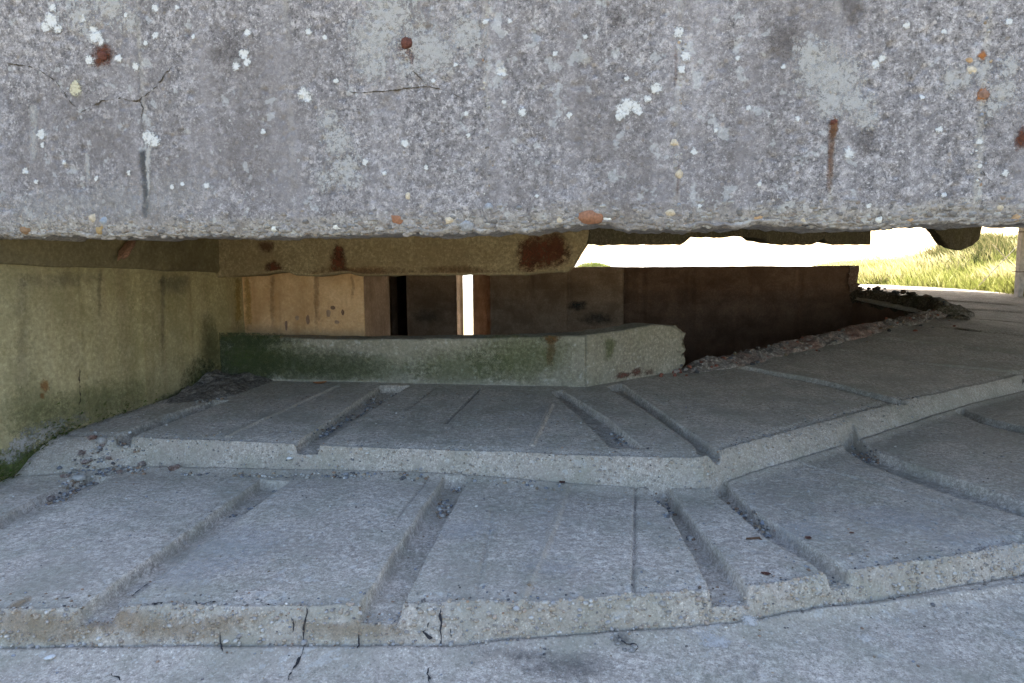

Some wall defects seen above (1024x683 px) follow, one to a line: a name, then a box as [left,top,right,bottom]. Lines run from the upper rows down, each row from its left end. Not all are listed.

rust [91,45,113,67]
crack [7,63,170,118]
crack [344,71,459,97]
rust [827,117,839,186]
rust [1015,126,1024,148]
leakage [139,147,152,216]
rust [314,245,403,274]
rust [518,234,569,272]
leakage [0,419,74,481]
crack [288,607,308,680]